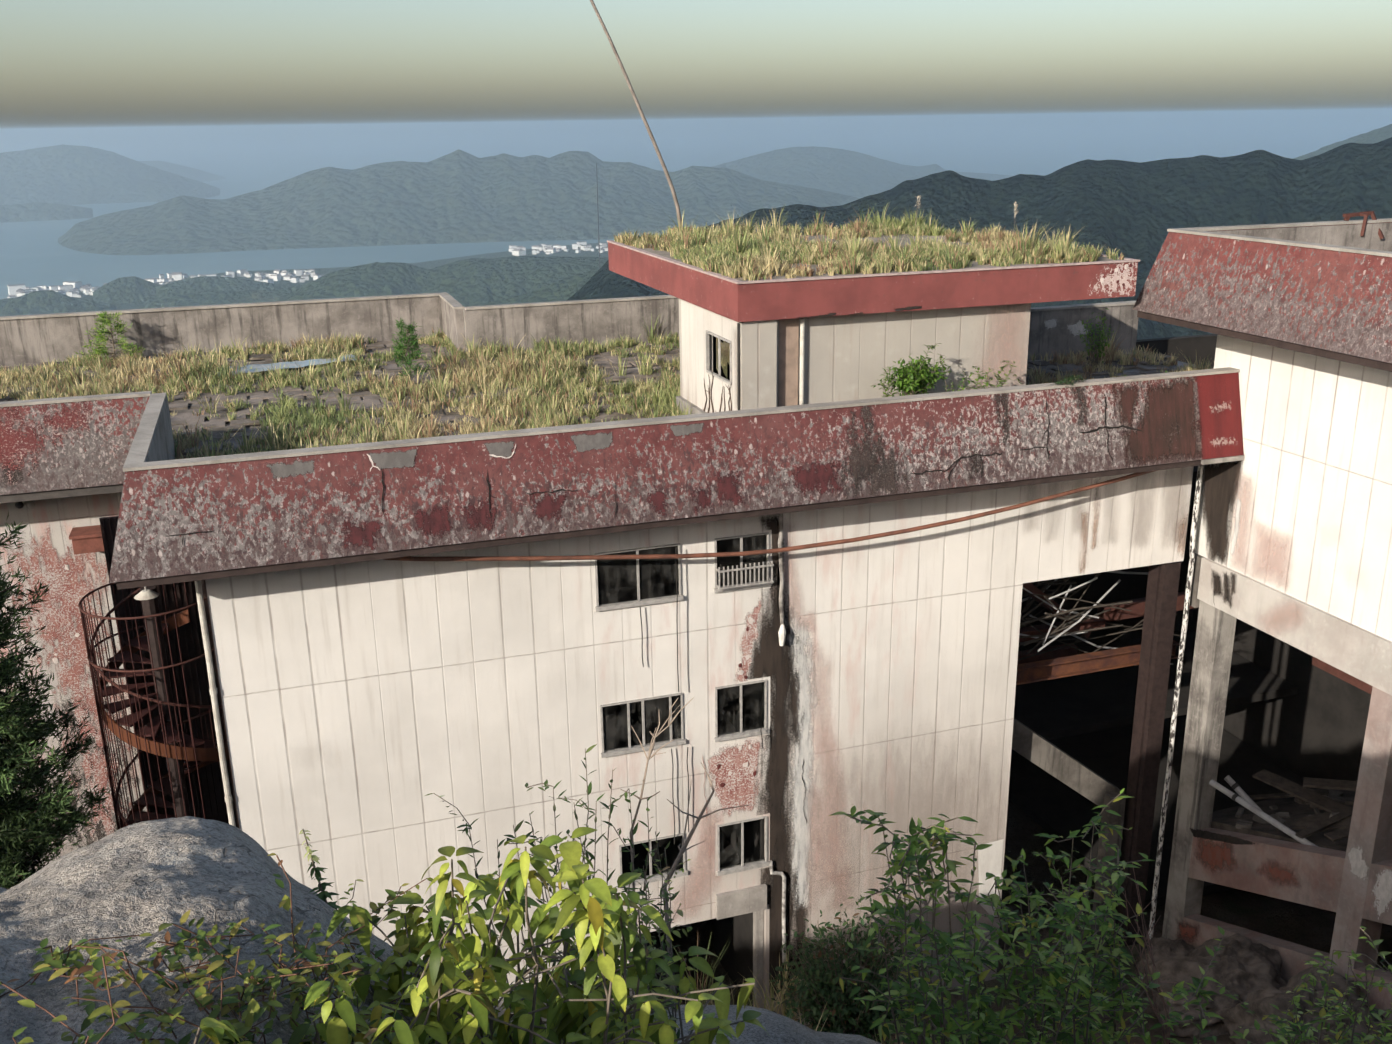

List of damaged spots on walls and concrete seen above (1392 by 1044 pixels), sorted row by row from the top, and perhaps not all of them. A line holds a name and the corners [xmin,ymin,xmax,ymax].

water stain [748,516,818,999]